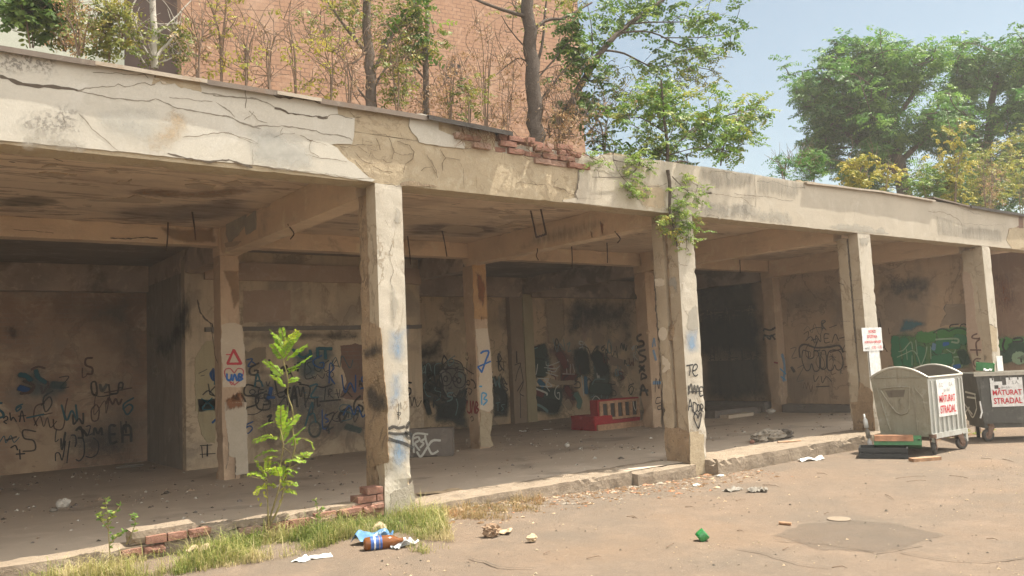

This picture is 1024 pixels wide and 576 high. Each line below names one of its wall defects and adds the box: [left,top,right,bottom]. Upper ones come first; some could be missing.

crack [0,72,477,188]
flaking render [453,132,624,177]
water stain [136,189,246,198]
crack [516,176,602,200]
peeling [658,324,675,341]
peeling [194,323,266,475]
spalling [664,427,724,487]